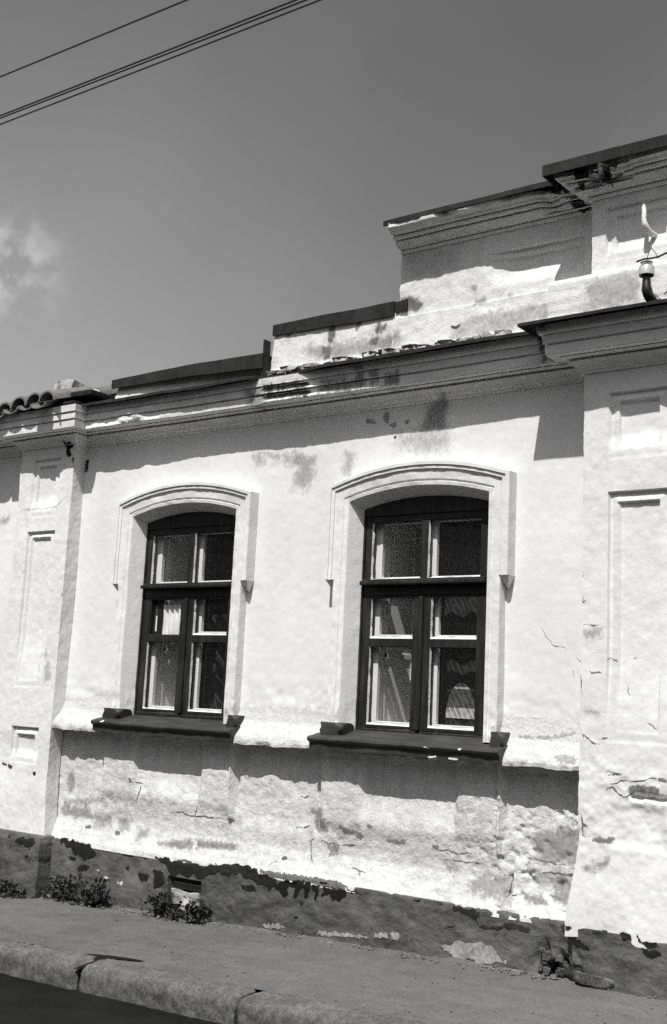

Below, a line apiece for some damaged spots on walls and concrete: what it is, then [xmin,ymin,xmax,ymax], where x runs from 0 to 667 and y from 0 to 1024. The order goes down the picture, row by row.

spalling [546,169,591,214]
leakage [404,296,422,311]
leakage [423,395,447,429]
crack [542,629,618,695]
crack [606,771,654,797]
crack [170,808,232,820]
spalling [327,824,372,856]
peeling [60,838,346,929]
spalling [434,901,530,932]
spalling [317,931,400,941]
spalling [441,940,507,965]
spalling [553,924,589,982]